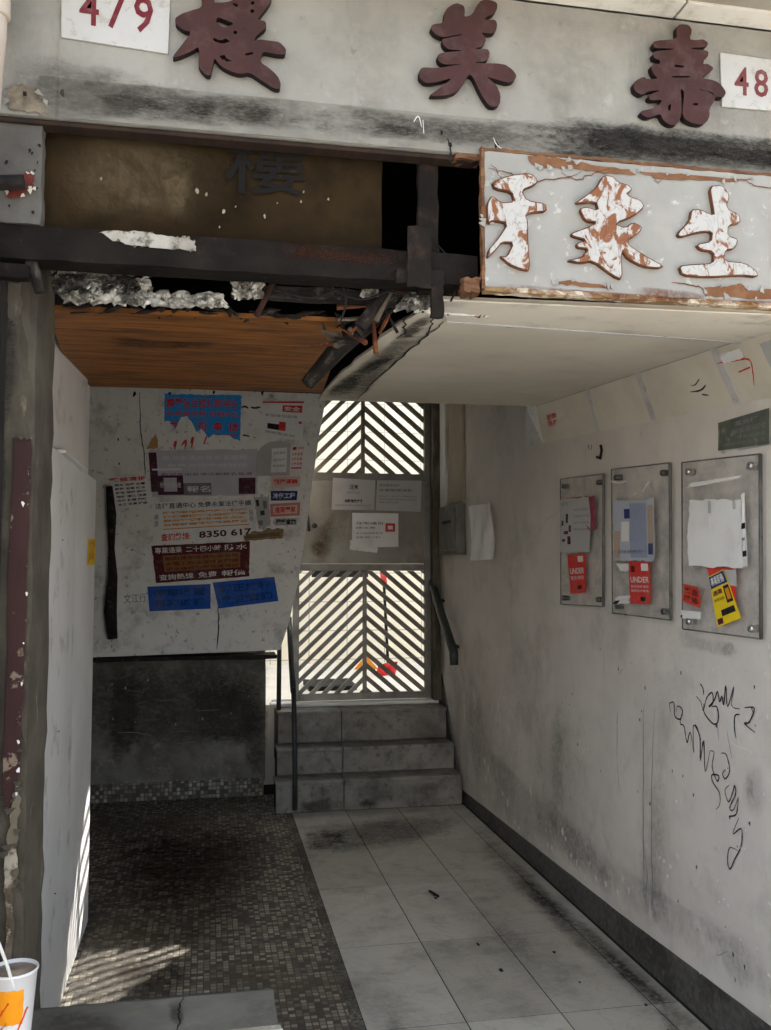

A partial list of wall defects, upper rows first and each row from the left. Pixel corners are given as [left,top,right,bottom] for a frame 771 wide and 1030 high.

spalling [3,81,49,114]
leakage [590,129,771,165]
spalling [48,270,265,309]
spalling [360,289,379,298]
crack [176,996,184,1030]